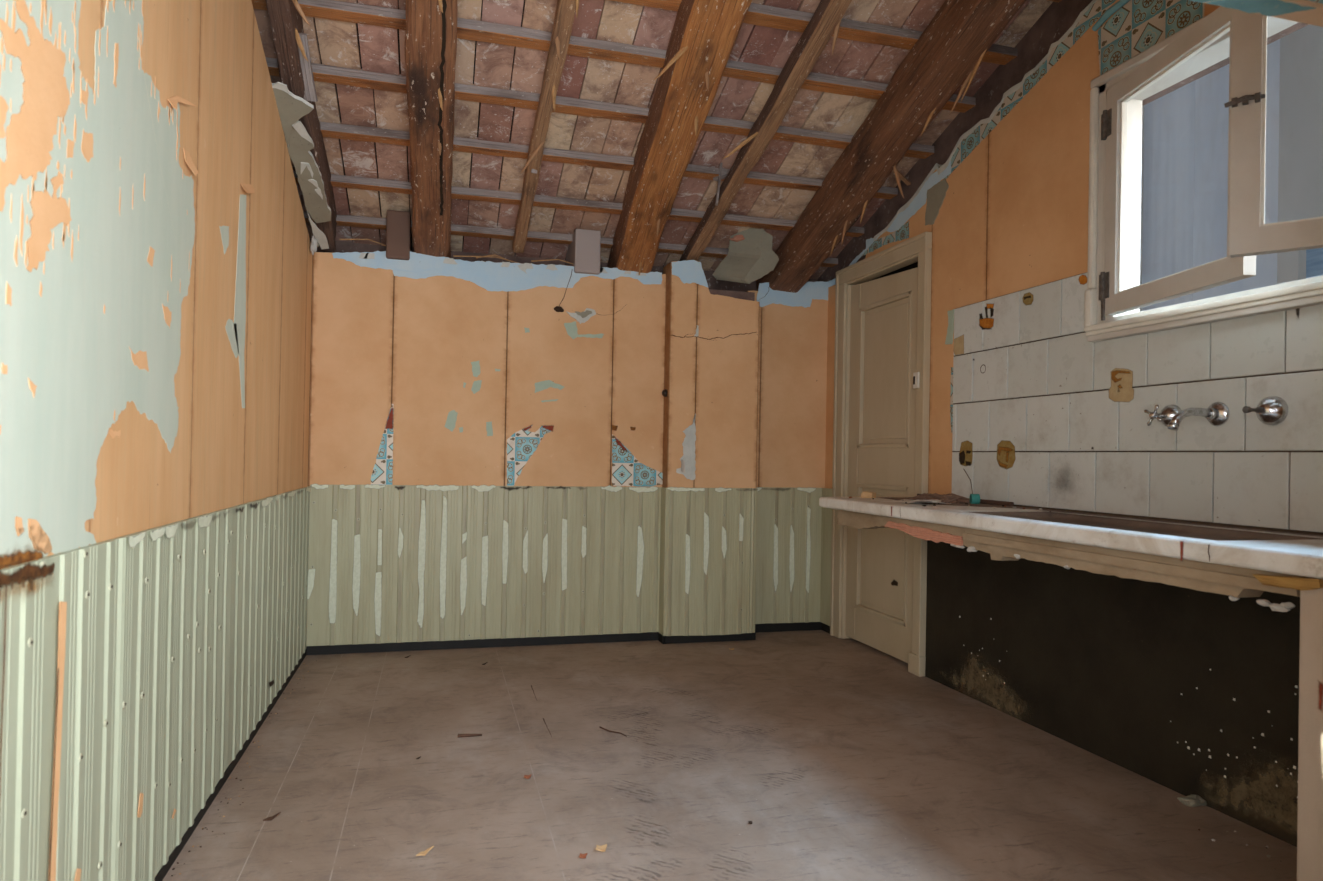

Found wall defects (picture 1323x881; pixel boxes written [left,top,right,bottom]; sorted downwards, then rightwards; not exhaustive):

peeling [0,0,198,566]
peeling [219,183,255,408]
corrosion [0,550,55,595]
peeling [307,519,382,636]
peeling [398,496,586,628]
peeling [636,526,644,597]
peeling [685,512,744,594]
peeling [773,507,811,593]
peeling [48,602,67,881]